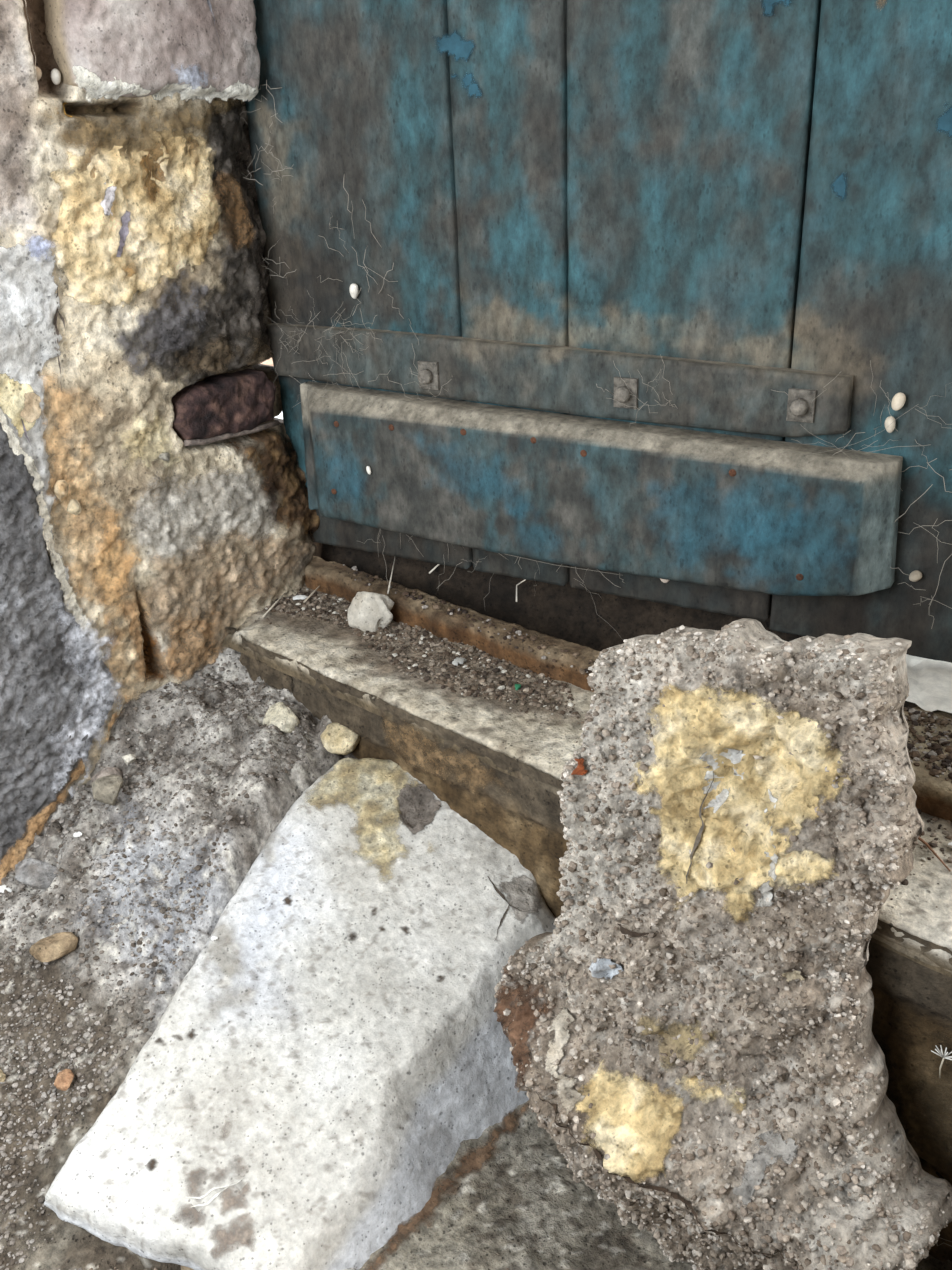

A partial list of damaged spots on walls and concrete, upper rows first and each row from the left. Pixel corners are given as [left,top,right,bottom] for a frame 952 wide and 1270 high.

flaking render [0,130,223,865]
water stain [44,97,273,389]